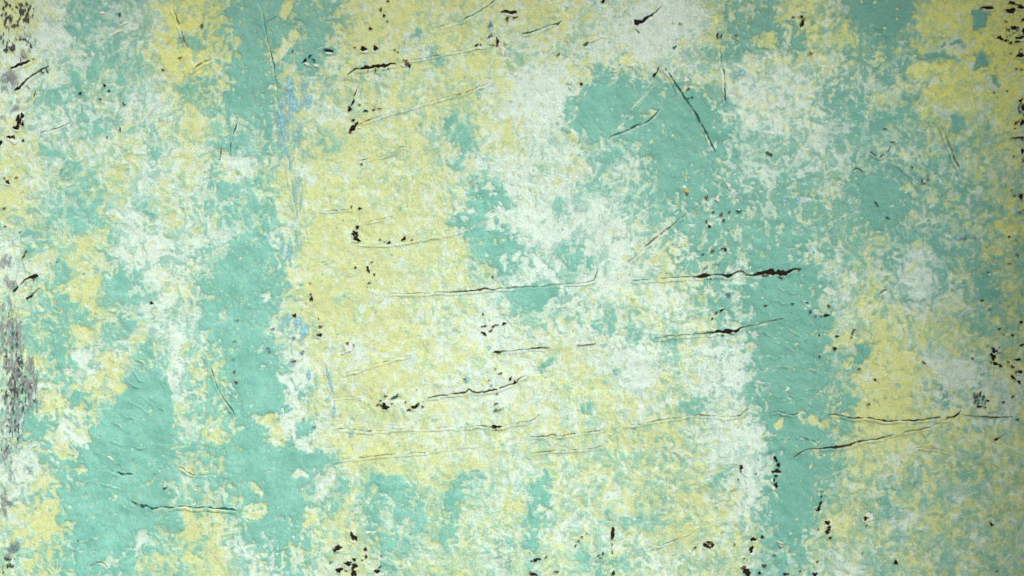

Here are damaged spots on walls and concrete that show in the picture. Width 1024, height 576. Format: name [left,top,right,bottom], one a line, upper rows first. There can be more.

peeling [941,1,1024,94]
crack [610,108,664,140]
peeling [1012,98,1024,163]
crack [392,269,601,297]
crack [633,268,801,285]
crack [655,318,783,342]
crack [428,347,551,401]
peeling [987,328,1024,403]
crack [332,397,1013,464]
crack [109,467,238,516]